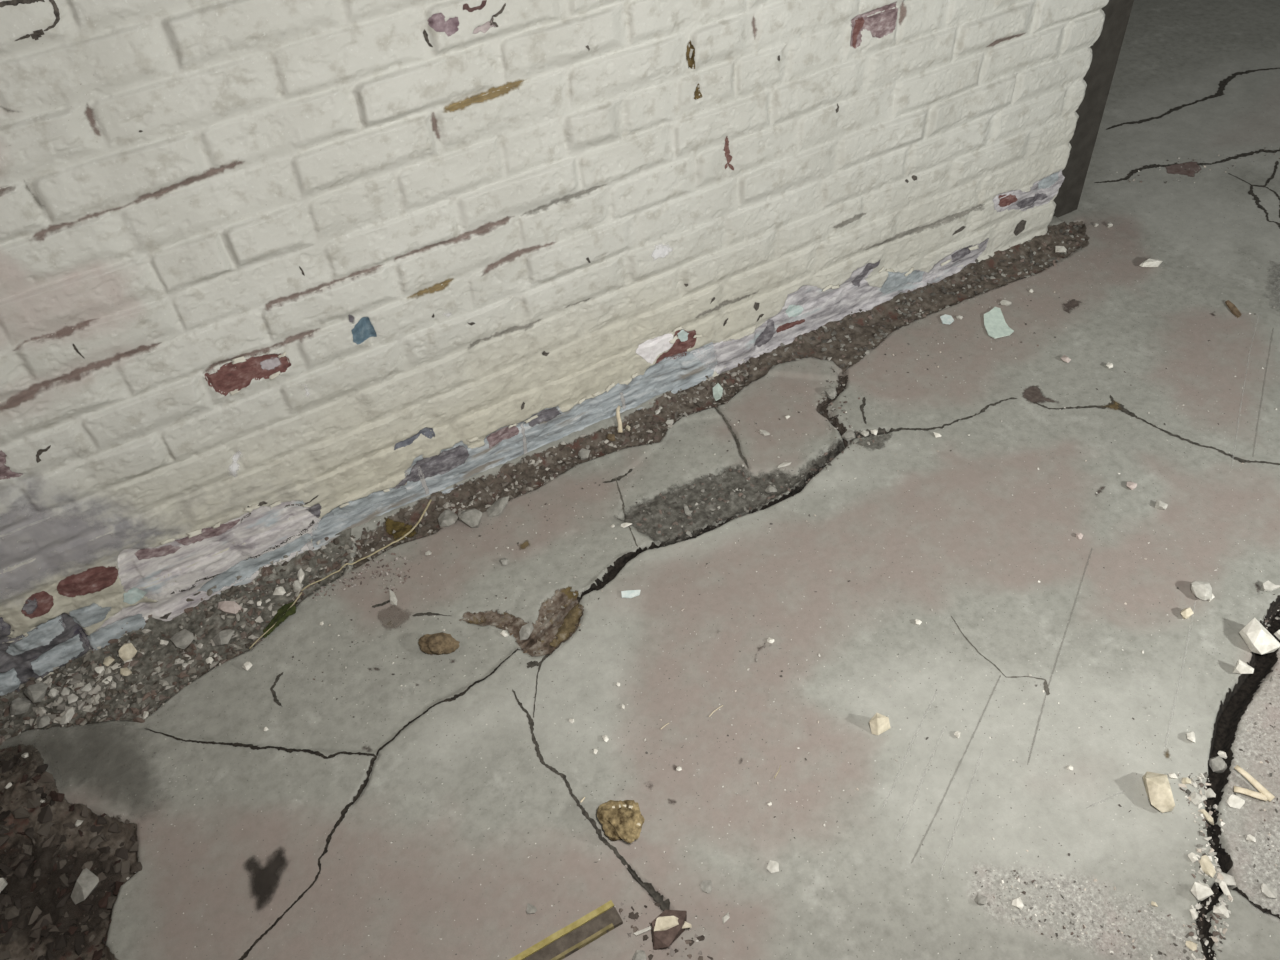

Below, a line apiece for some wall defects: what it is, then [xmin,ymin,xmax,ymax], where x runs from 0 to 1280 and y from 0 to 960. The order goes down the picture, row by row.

peeling [428,13,496,36]
peeling [850,2,898,49]
crack [1106,68,1280,130]
peeling [993,169,1065,236]
crack [1094,149,1280,229]
peeling [984,307,1014,339]
peeling [0,226,989,696]
crack [577,375,1280,602]
crack [171,495,319,594]
crack [951,616,1050,695]
crack [145,647,670,960]
crack [1195,595,1280,960]